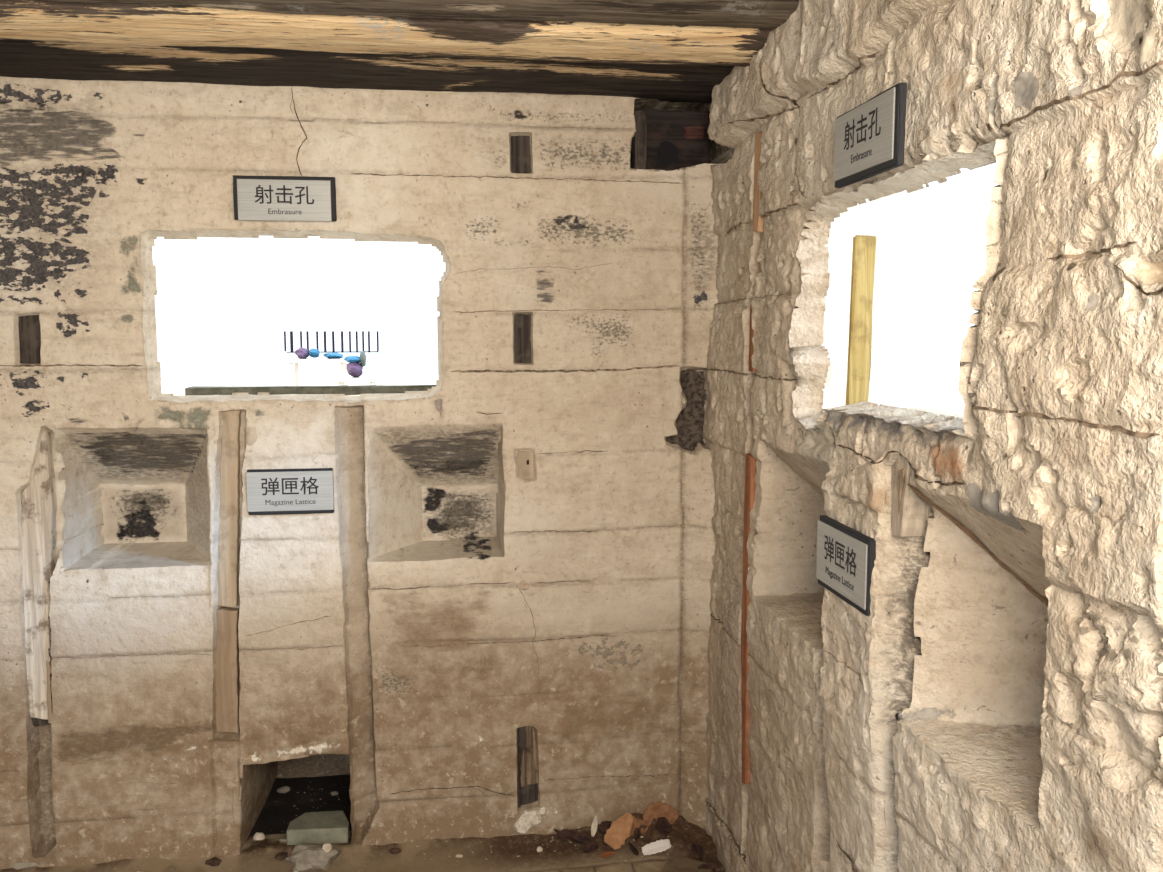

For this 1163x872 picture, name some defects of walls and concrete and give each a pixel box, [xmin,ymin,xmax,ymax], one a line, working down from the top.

crack [290,92,309,176]
mould [0,84,119,337]
mould [539,215,632,246]
crack [1047,241,1163,296]
crack [837,445,964,486]